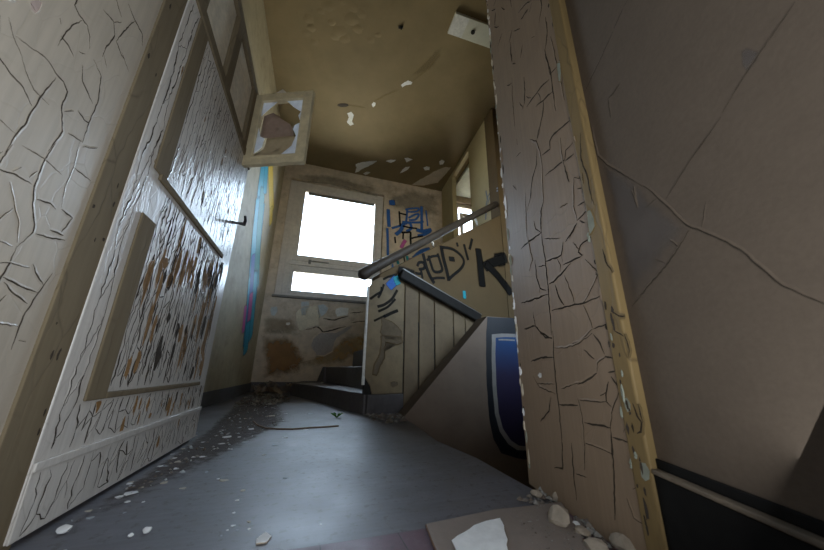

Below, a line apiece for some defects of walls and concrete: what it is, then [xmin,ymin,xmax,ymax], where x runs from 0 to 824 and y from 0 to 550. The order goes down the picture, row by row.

crack [0,0,248,537]
damp [265,339,302,374]
peeling [354,160,377,175]
peeling [410,160,452,186]
peeling [486,0,513,281]
crack [492,0,824,524]